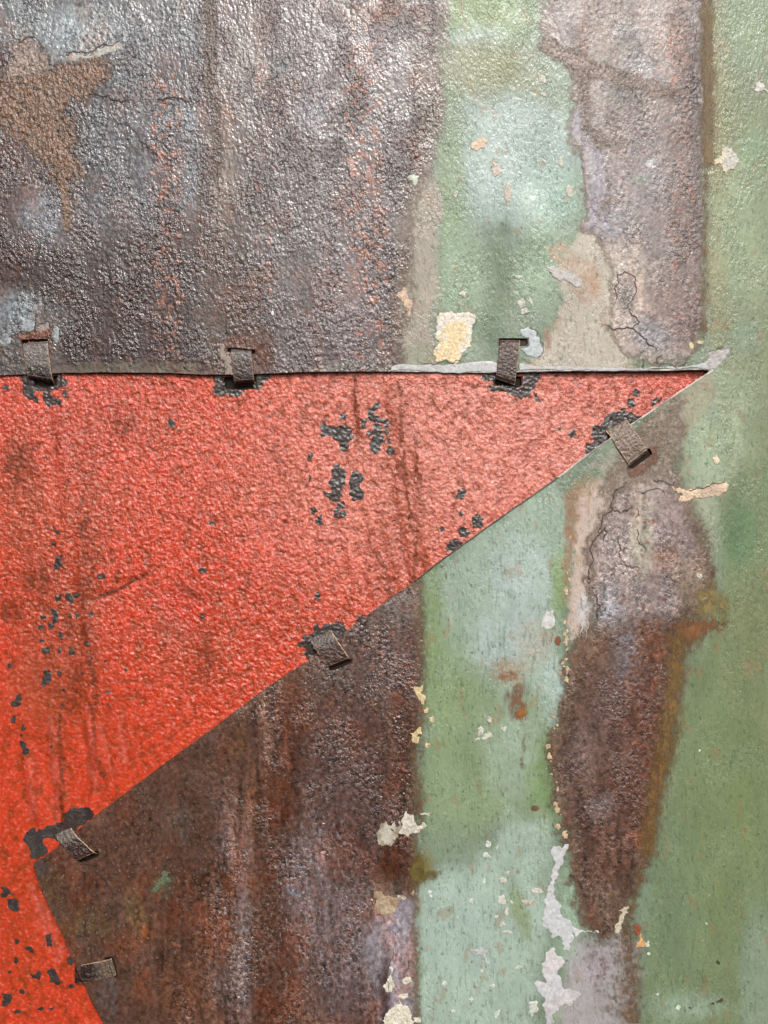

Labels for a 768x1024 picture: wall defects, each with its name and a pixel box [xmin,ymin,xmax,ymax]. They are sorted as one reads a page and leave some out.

rust [0,0,449,444]
peeling [391,311,731,402]
crack [603,271,731,367]
peeling [310,402,395,526]
crack [588,479,718,617]
peeling [672,482,729,501]
peeling [38,592,107,663]
rust [34,390,426,1024]
rust [531,395,729,1023]
peeling [23,807,94,860]
peeling [376,812,430,846]
peeling [495,744,599,1024]